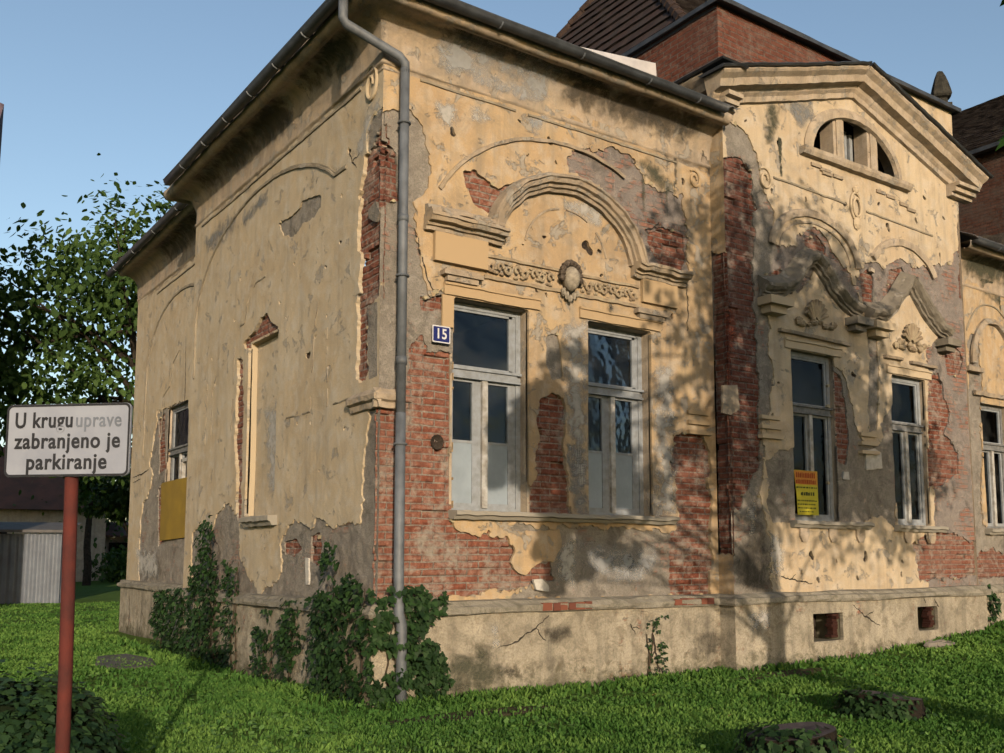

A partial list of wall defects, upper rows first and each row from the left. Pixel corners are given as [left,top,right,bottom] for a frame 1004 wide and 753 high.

flaking render [136,103,1004,611]
crack [500,616,549,647]